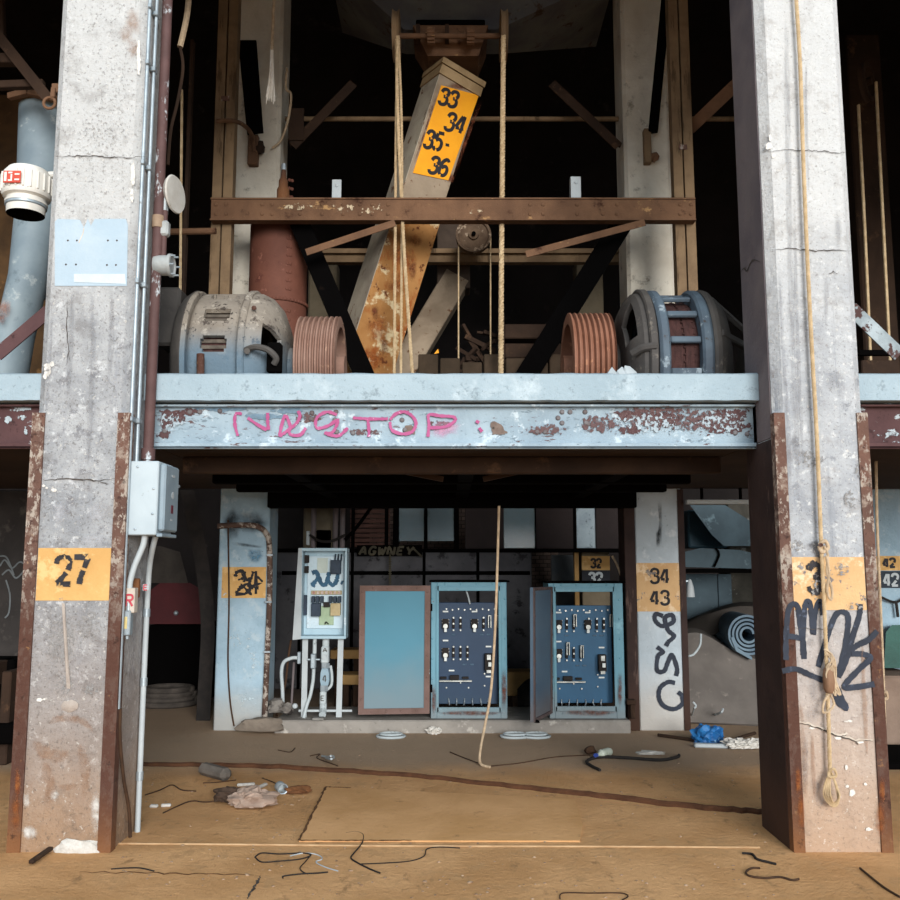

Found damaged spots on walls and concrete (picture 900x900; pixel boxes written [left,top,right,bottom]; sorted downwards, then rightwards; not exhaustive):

crack [60,153,141,161]
crack [742,248,844,274]
peeling [4,407,31,434]
peeling [156,407,323,439]
peeling [522,424,566,436]
peeling [582,403,753,436]
crack [44,477,110,485]
crack [799,721,872,744]